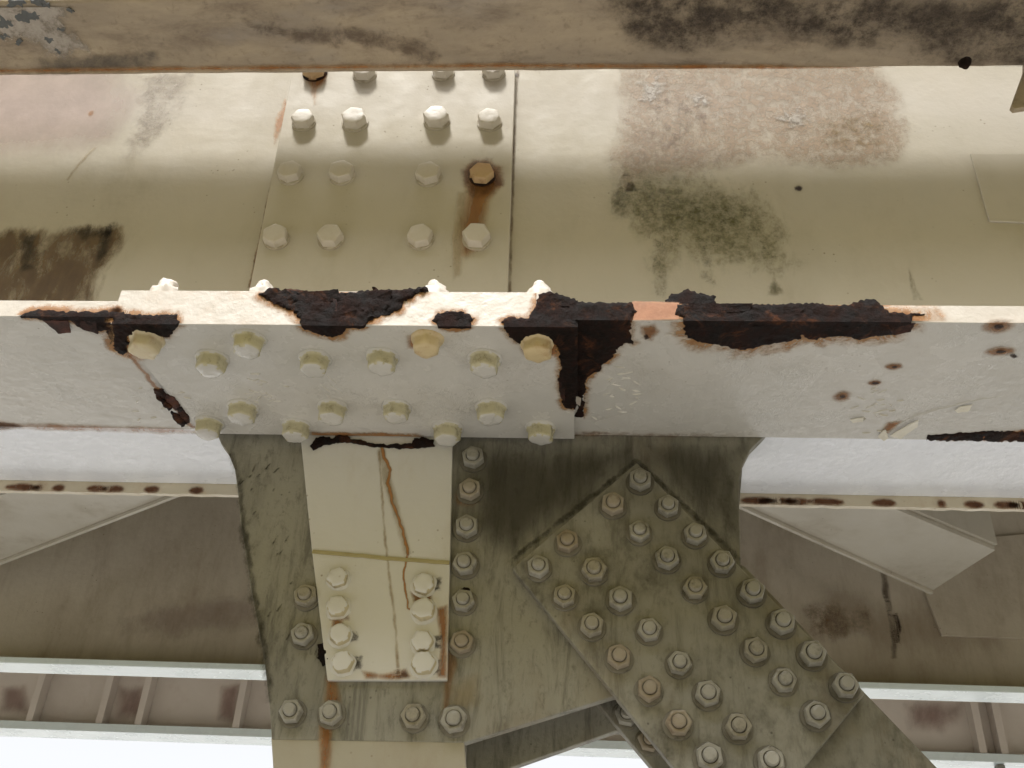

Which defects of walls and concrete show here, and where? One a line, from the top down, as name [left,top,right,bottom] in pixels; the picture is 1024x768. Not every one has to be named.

damp [79,226,112,259]
damp [614,178,774,259]
corrosion [17,305,182,359]
corrosion [249,244,429,341]
corrosion [498,291,657,418]
corrosion [665,289,944,354]
corrosion [985,321,1010,332]
corrosion [310,432,435,460]
corrosion [927,430,1024,442]
crack [381,447,410,610]
corrosion [742,497,843,505]
crack [883,575,901,647]